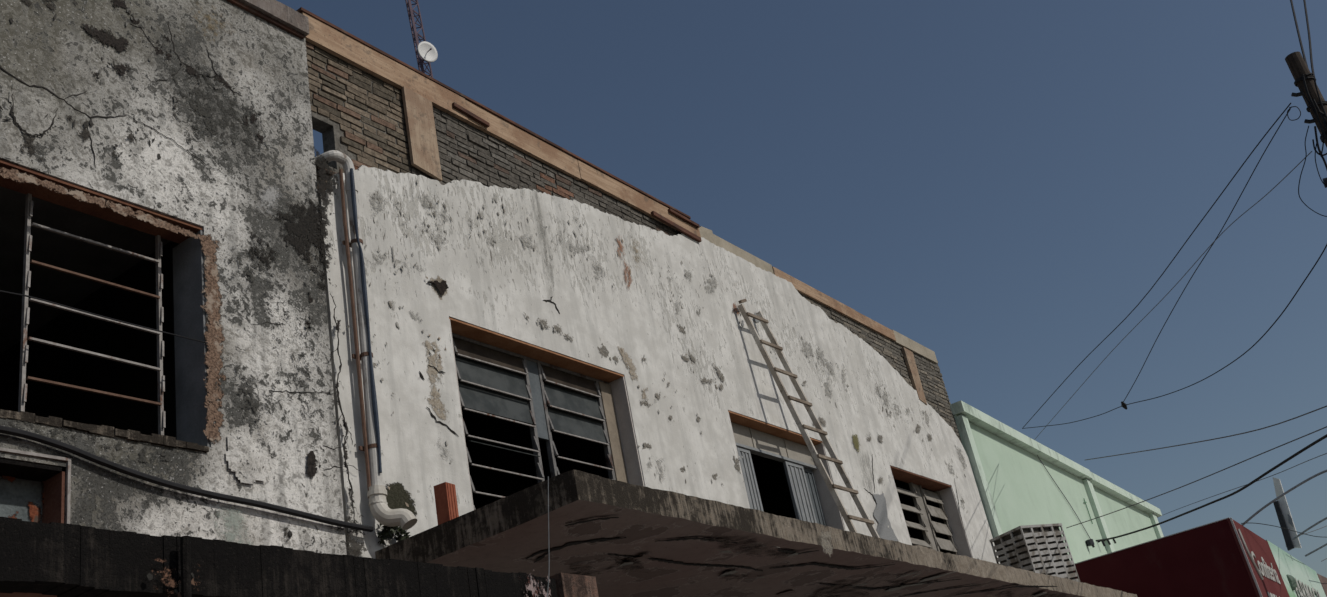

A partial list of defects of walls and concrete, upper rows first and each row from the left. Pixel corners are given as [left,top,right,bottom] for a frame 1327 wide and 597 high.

crack [131,21,242,96]
crack [0,49,222,173]
damp [171,64,274,164]
flaking render [0,167,227,444]
damp [225,147,339,312]
spalling [366,245,449,300]
peeling [369,179,453,251]
damp [225,335,276,428]
damp [287,315,326,397]
peeling [388,301,459,463]
spalling [864,434,898,541]
crack [525,517,1058,597]